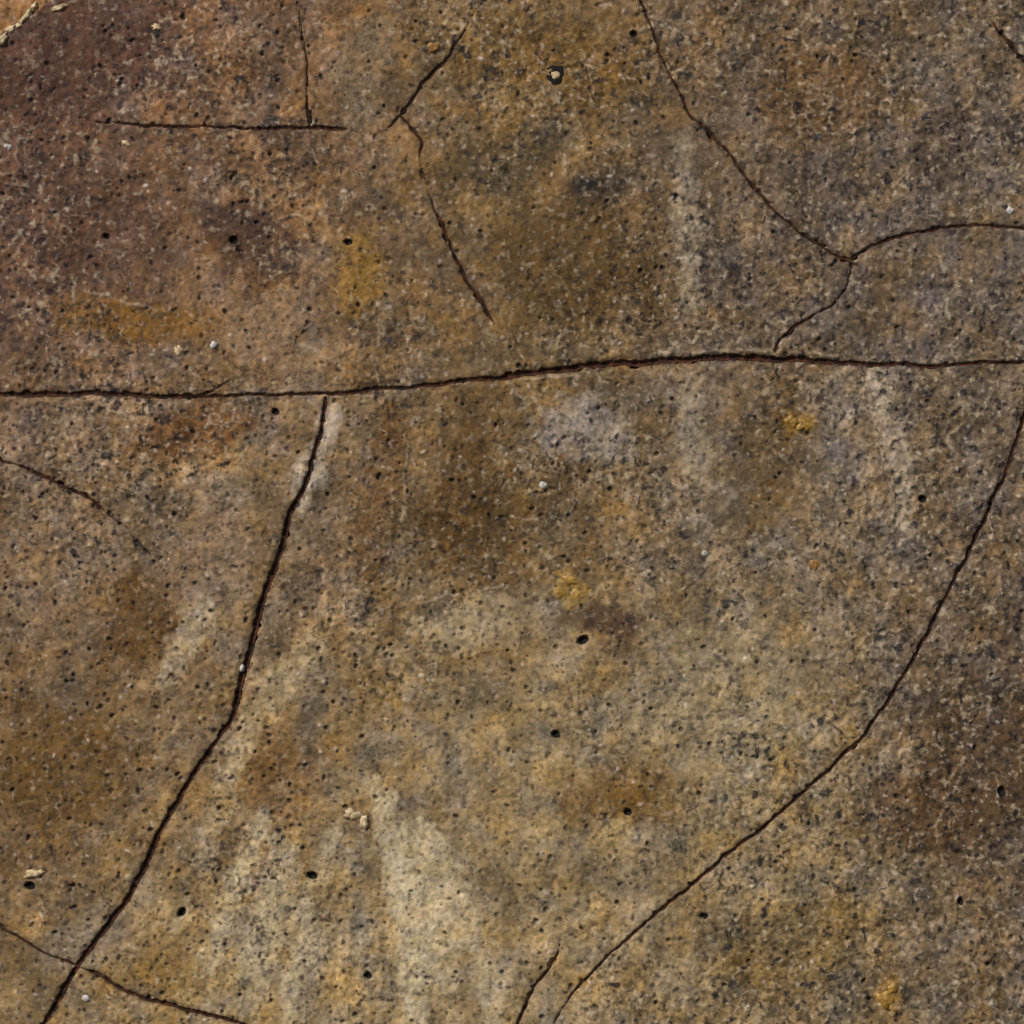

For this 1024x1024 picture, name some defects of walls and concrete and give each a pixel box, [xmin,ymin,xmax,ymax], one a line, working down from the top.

crack [84,0,494,322]
crack [640,0,1024,353]
crack [0,354,1024,1024]